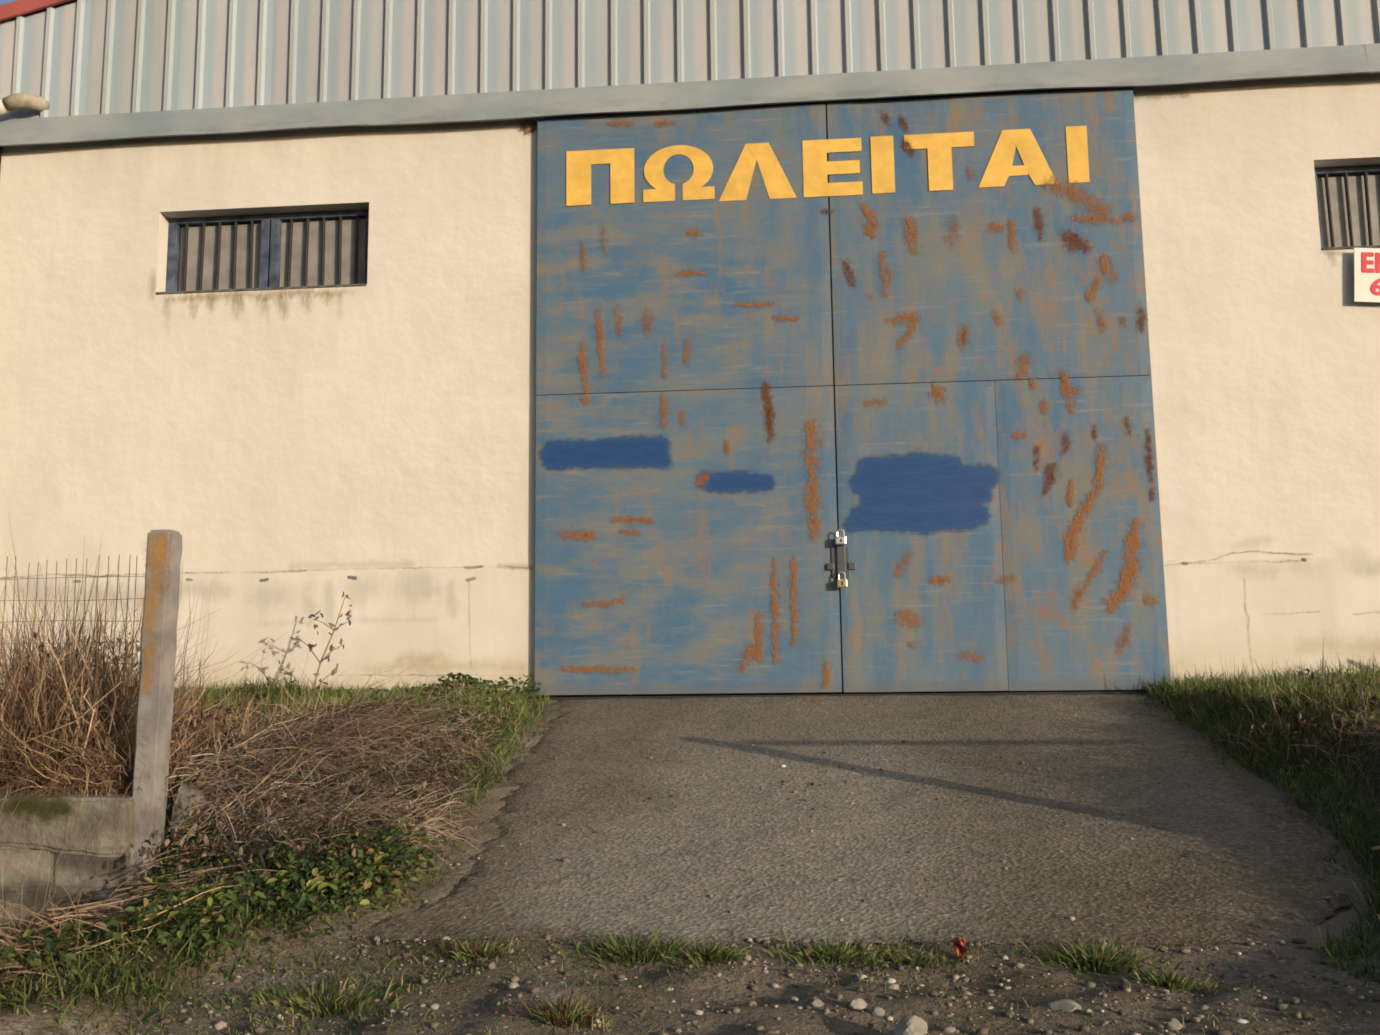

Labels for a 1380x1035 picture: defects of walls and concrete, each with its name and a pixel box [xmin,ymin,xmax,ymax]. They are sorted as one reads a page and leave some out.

rust [882,113,915,156]
rust [859,202,893,298]
rust [1045,179,1135,301]
rust [577,309,606,404]
rust [888,312,917,348]
rust [1098,304,1146,332]
rust [762,382,775,442]
rust [803,420,823,539]
rust [1013,426,1108,563]
rust [1125,416,1155,501]
rust [741,555,799,671]
rust [1085,517,1159,614]